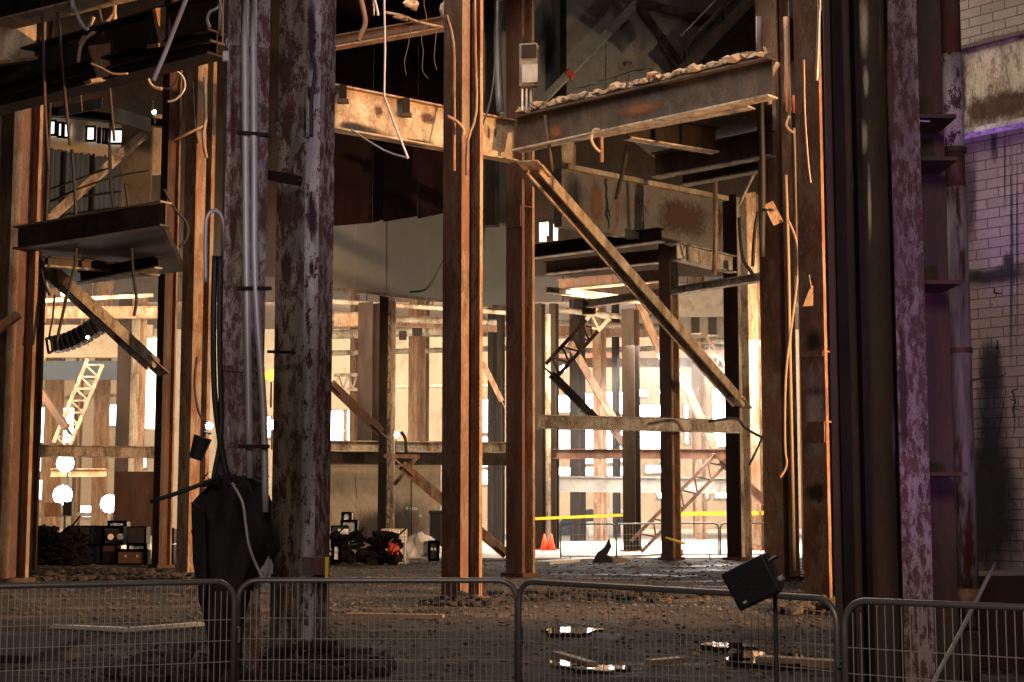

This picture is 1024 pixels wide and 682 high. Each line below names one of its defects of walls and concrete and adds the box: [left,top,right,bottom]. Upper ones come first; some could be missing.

rust [660,200,705,235]
rust [282,256,291,286]